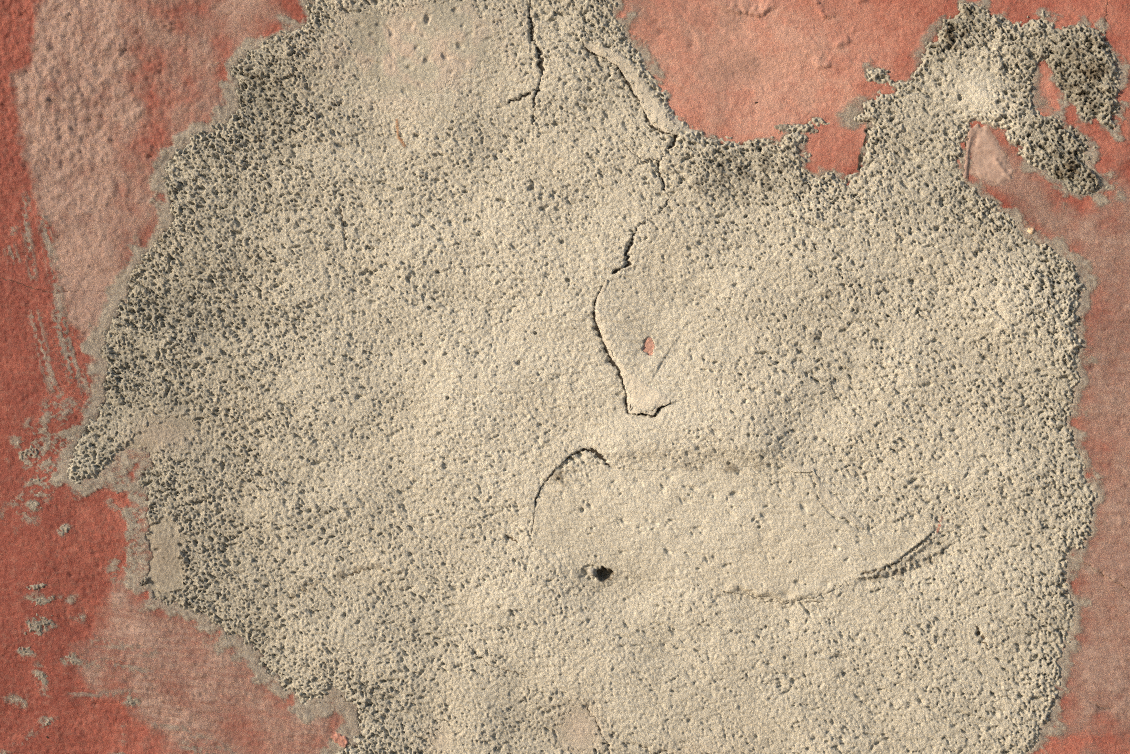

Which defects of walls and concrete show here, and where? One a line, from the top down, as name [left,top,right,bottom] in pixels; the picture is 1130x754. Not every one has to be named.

crack [508,0,545,123]
peeling [584,42,696,136]
peeling [963,123,1014,186]
crack [584,44,677,417]
peeling [595,279,671,415]
crack [506,448,610,543]
spalling [533,450,933,602]
crack [863,537,937,574]